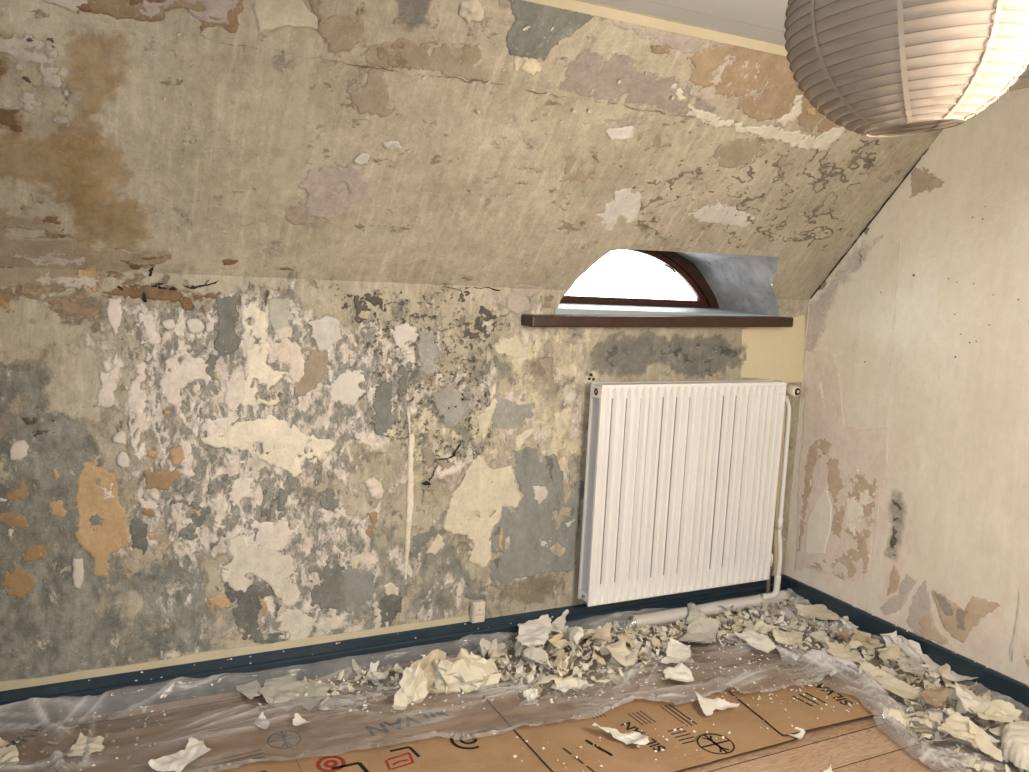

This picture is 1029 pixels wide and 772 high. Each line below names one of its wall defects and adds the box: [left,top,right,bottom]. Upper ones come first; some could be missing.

peeling [44,0,492,118]
peeling [503,0,593,76]
peeling [545,19,846,169]
damp [0,35,145,249]
peeling [560,154,597,184]
spalling [596,188,642,232]
spalling [687,199,755,230]
damp [591,333,746,378]
damp [0,413,55,440]
peeling [0,204,585,644]
damp [887,495,903,557]
peeling [880,565,1000,645]